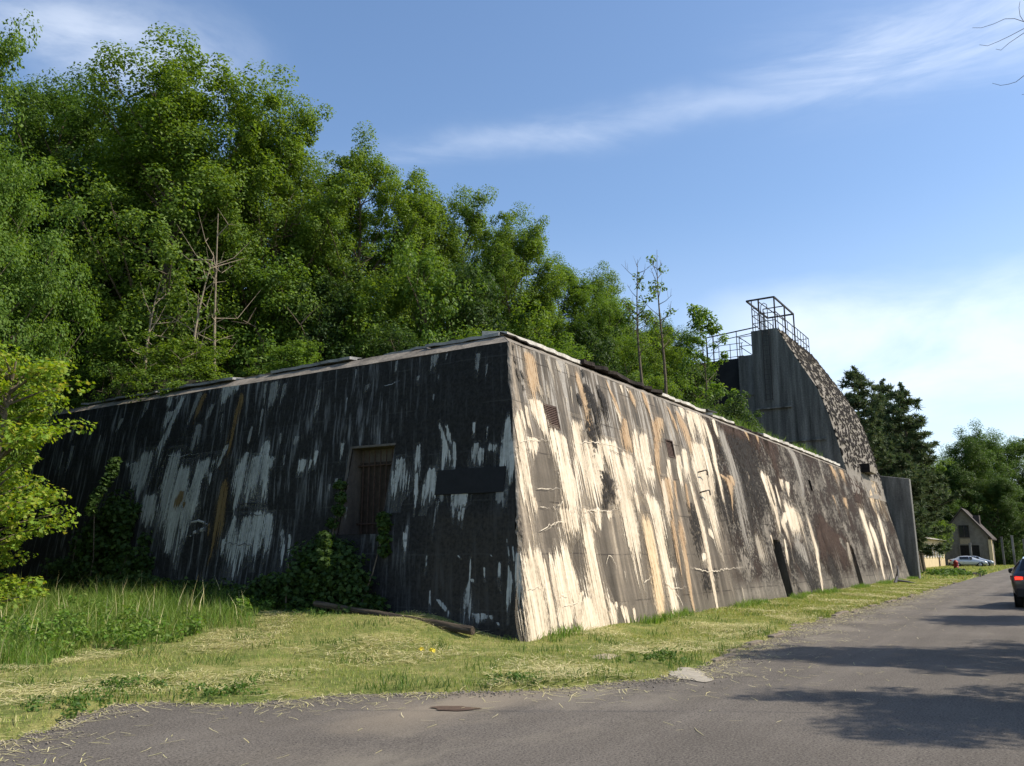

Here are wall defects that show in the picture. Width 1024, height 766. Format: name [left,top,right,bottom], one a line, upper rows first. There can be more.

peeling [577,369,610,456]
peeling [600,470,618,511]
peeling [687,503,719,597]